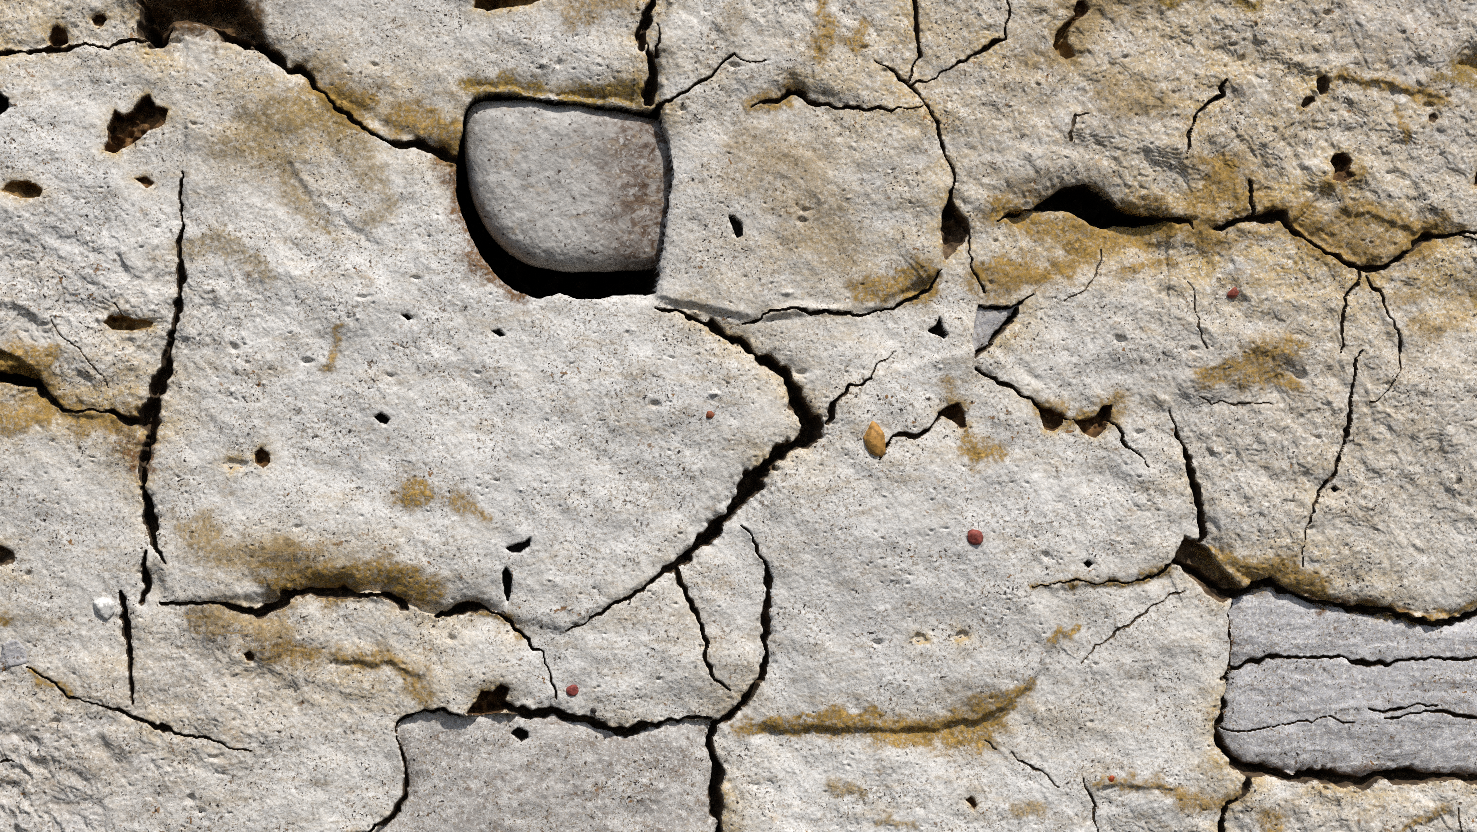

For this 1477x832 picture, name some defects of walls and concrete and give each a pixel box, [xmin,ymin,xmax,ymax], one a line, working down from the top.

crack [0,0,173,56]
spalling [456,94,674,299]
crack [1186,78,1229,154]
crack [26,0,1149,832]
crack [1031,179,1477,832]
spalling [511,728,528,742]